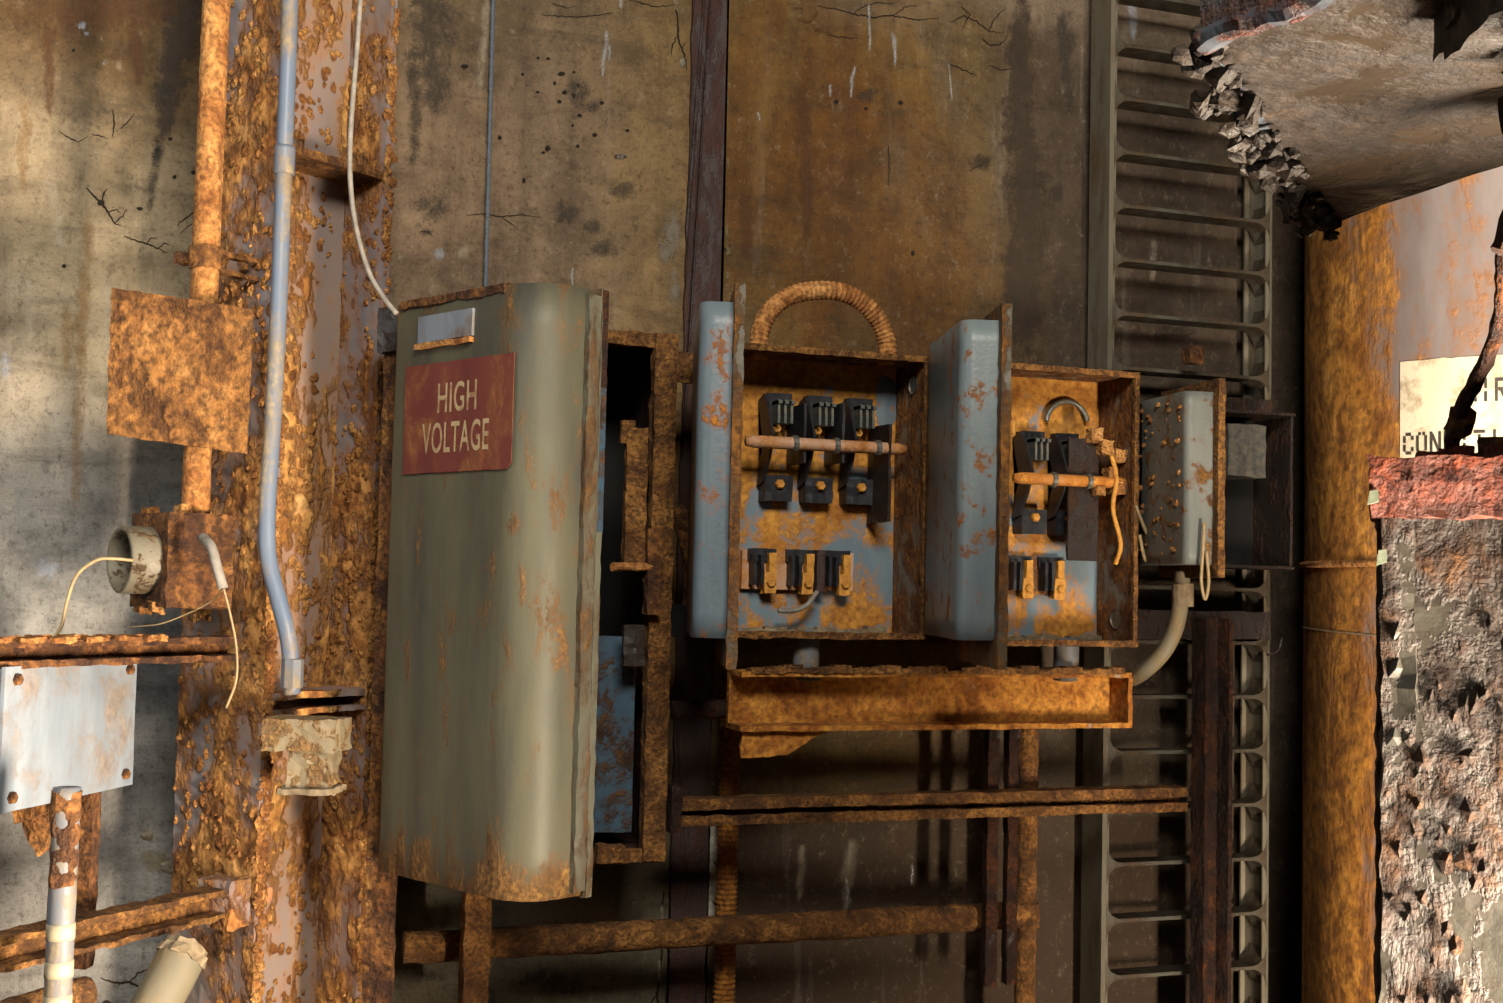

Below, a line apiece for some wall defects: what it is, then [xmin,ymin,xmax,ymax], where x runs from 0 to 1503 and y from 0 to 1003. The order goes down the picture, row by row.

crack [60,109,134,143]
damp [29,0,202,207]
crack [86,187,193,253]
crack [818,2,1012,77]
damp [1001,0,1063,354]
corrosion [173,0,401,1003]